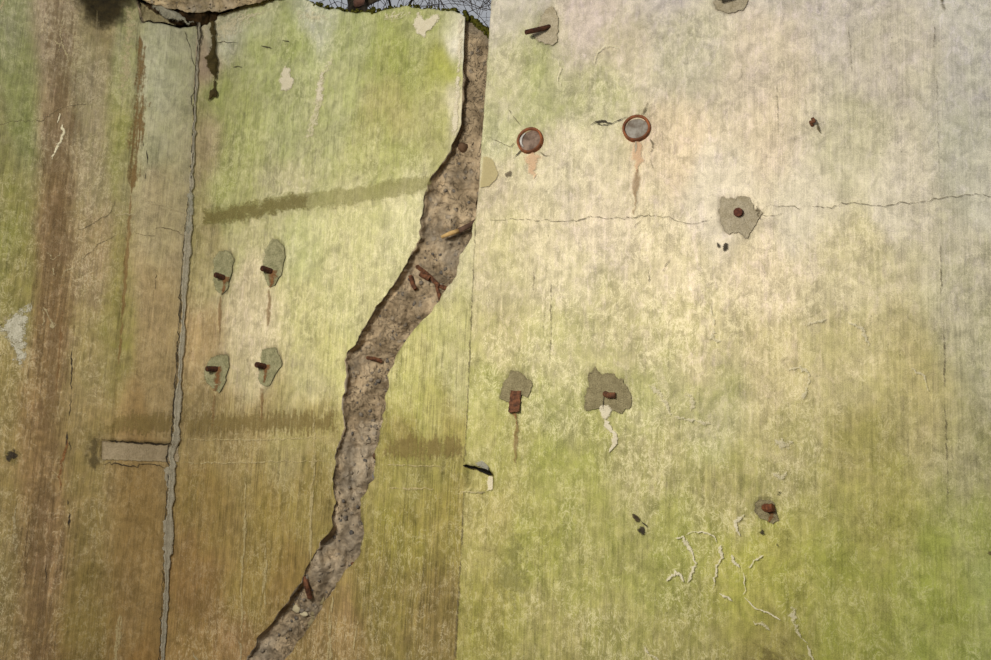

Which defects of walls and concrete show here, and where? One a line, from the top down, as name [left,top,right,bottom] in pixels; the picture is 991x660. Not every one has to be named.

crack [591,103,654,168]
spalling [718,196,763,238]
crack [755,193,991,219]
spalling [0,305,32,365]
crack [249,21,549,660]
spalling [584,367,632,414]